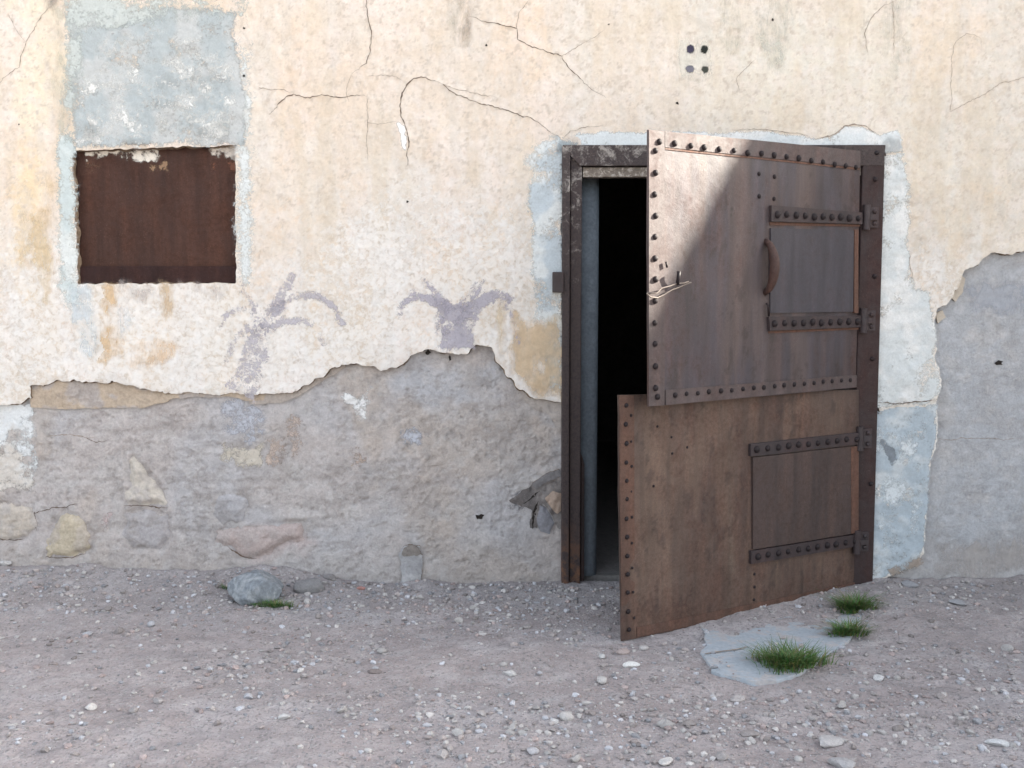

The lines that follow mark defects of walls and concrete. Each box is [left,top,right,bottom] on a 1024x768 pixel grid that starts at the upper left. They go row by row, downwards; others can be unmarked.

crack [2,4,54,79]
peeling [76,46,236,162]
crack [259,0,559,159]
crack [470,3,605,93]
crack [950,33,1019,112]
rust [665,148,860,170]
rust [769,222,860,313]
flaking render [0,125,647,584]
flaking render [672,123,1024,580]
rust [851,446,859,534]